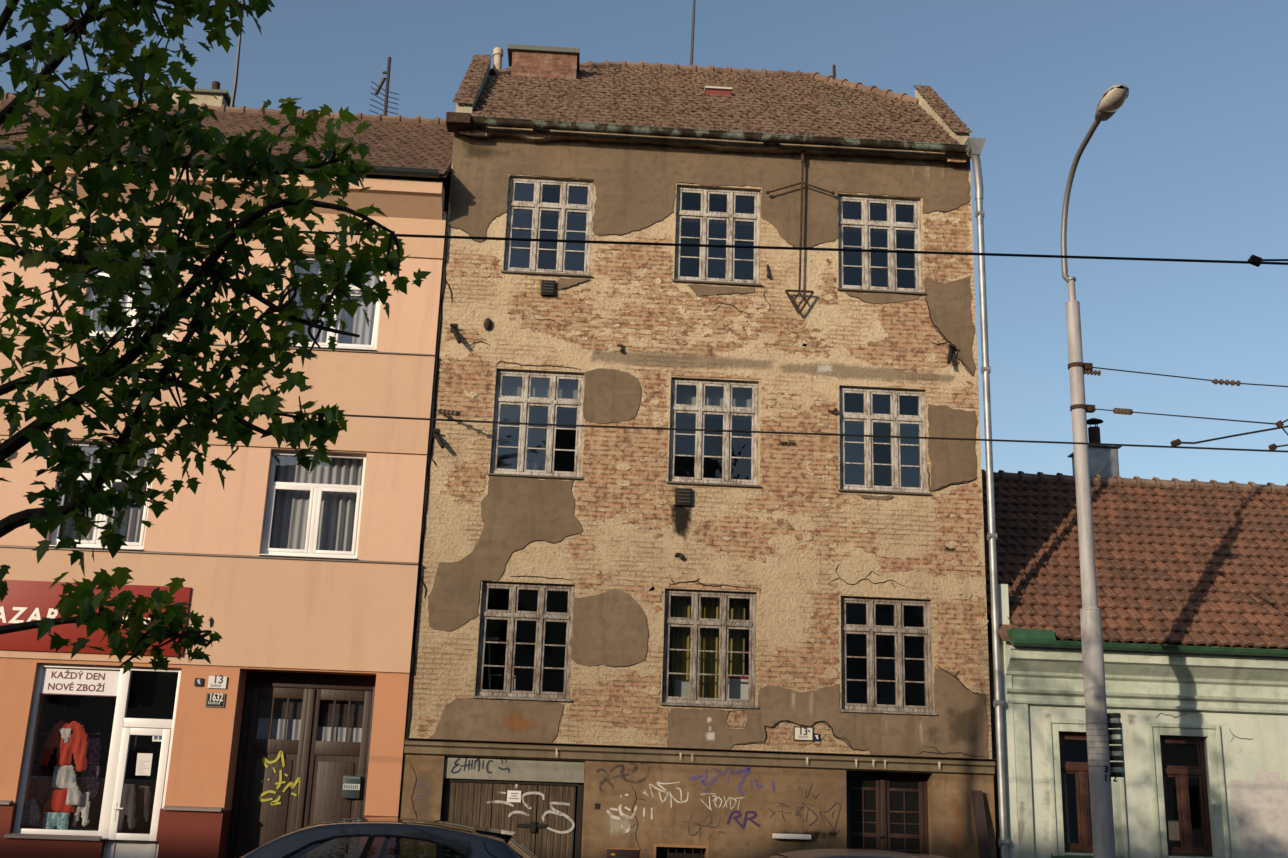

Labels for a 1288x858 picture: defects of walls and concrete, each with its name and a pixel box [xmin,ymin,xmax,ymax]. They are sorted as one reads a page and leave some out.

flaking render [427,126,989,760]
crack [828,565,907,587]
crack [739,720,867,751]